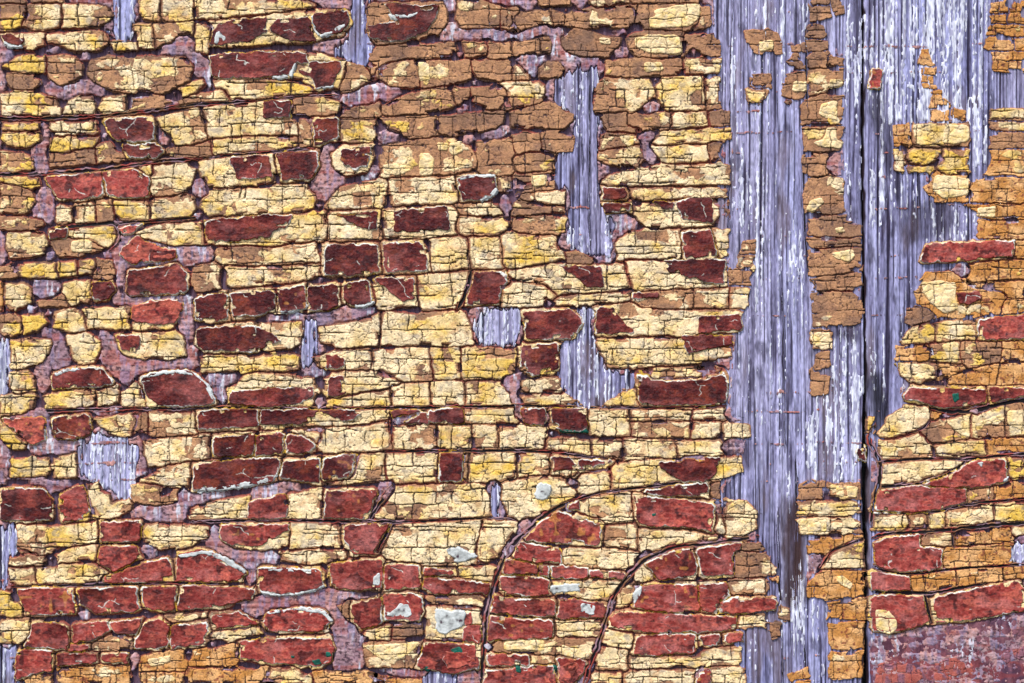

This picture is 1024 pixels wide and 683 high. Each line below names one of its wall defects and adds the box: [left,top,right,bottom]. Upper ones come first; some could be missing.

crack [10,580,224,588]
crack [51,216,198,253]
crack [0,147,314,177]
crack [0,94,339,121]
crack [37,403,725,414]
peeling [0,0,866,622]
crack [189,481,692,683]
crack [385,448,613,460]
crack [582,292,808,683]
peeling [795,326,1024,680]
crack [819,397,1024,623]
peeling [863,0,1024,460]